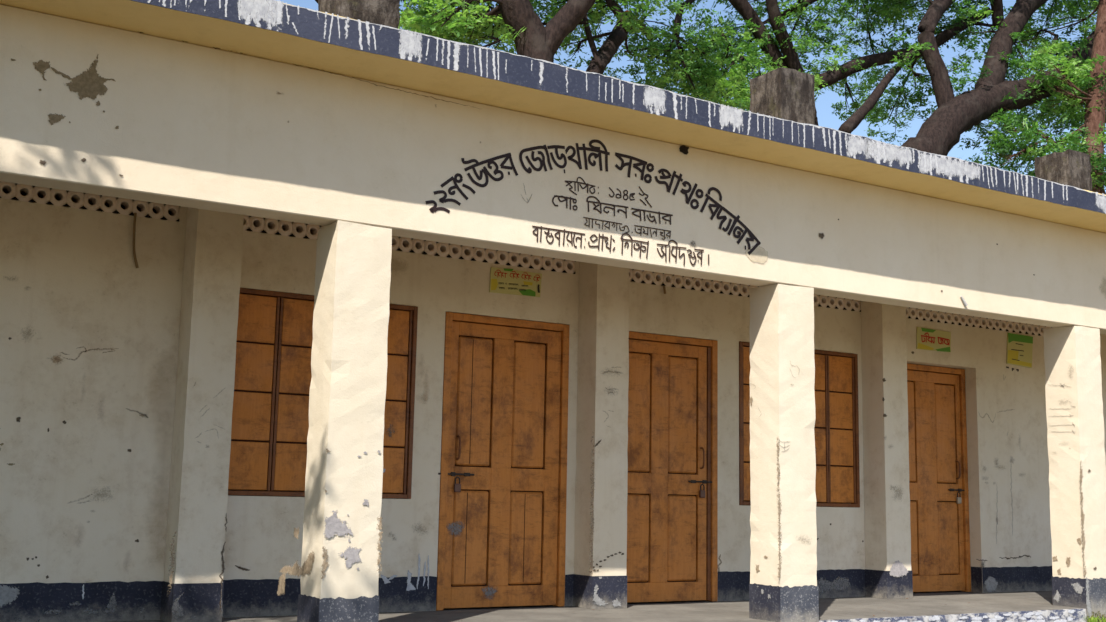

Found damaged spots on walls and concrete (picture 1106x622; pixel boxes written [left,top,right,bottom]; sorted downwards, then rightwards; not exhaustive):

damp [237,0,298,34]
damp [324,12,383,50]
damp [399,29,507,80]
damp [605,79,666,116]
damp [713,102,1053,200]
damp [1096,193,1106,214]
spalling [277,510,362,596]
spalling [589,437,624,607]
spalling [756,438,782,580]
peeling [956,460,1097,622]
peeling [0,585,20,608]
peeling [817,577,850,595]